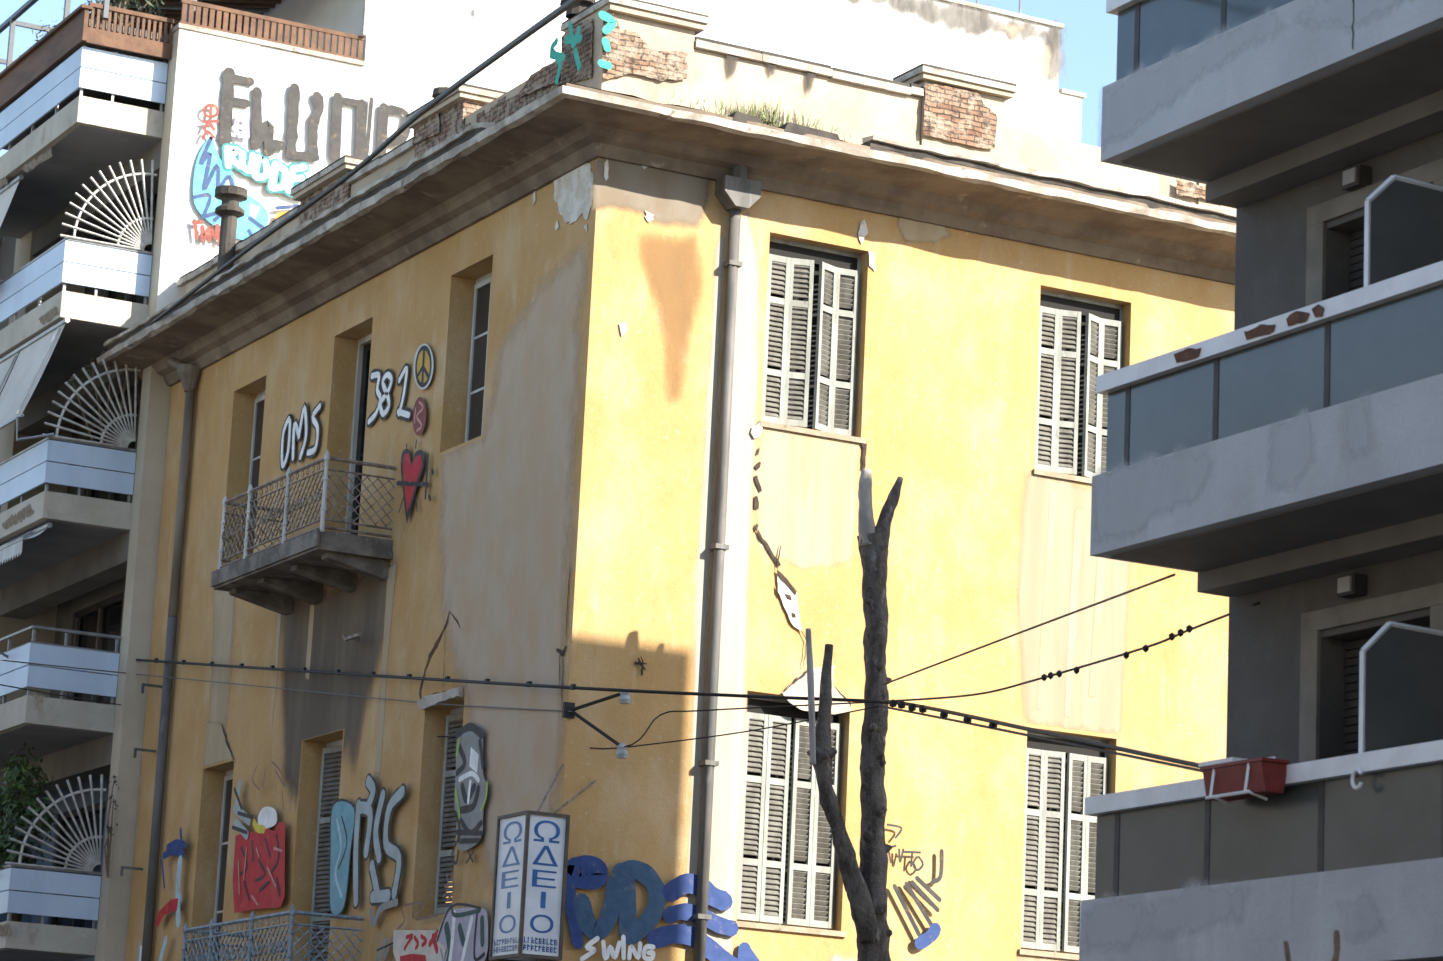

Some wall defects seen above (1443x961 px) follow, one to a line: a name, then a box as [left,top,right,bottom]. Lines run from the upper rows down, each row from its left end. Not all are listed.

flaking render [517,13,688,99]
water stain [853,0,1064,81]
flaking render [413,113,440,144]
flaking render [923,83,997,149]
flaking render [553,157,710,232]
peeling [858,219,875,271]
water stain [644,214,759,952]